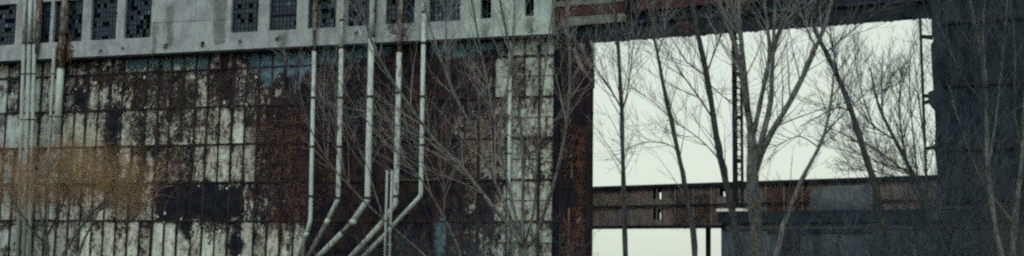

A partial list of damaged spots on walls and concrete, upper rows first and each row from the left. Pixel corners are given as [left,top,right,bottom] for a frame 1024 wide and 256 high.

water stain [126,54,213,75]
rust [245,109,336,245]
rust [511,84,651,256]